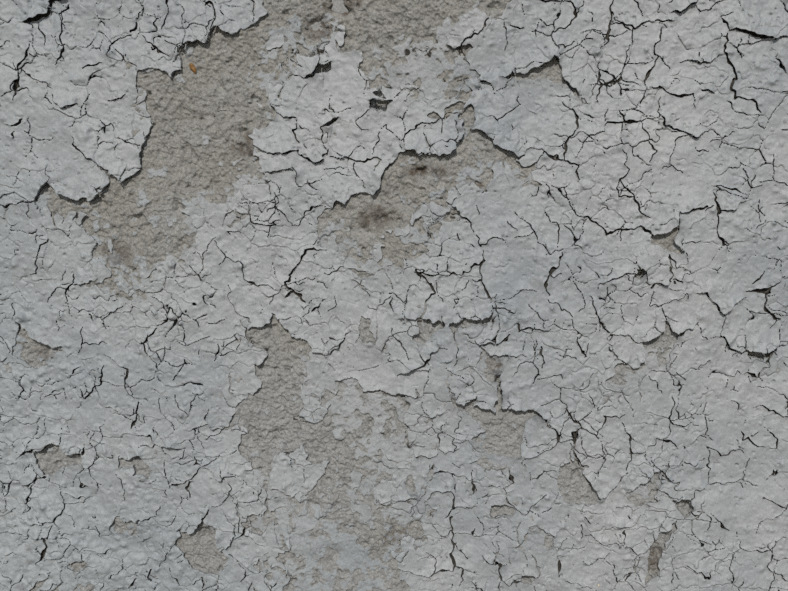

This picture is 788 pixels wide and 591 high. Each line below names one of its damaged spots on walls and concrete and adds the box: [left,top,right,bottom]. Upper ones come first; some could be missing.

crack [0,197,37,216]
crack [26,227,53,280]
crack [0,0,221,175]
peeling [20,0,595,303]
crack [136,0,788,374]
peeling [26,433,96,483]
crack [0,271,248,591]
peeling [215,294,566,591]
crack [322,152,788,591]
peeling [171,510,240,586]
crack [221,510,265,591]